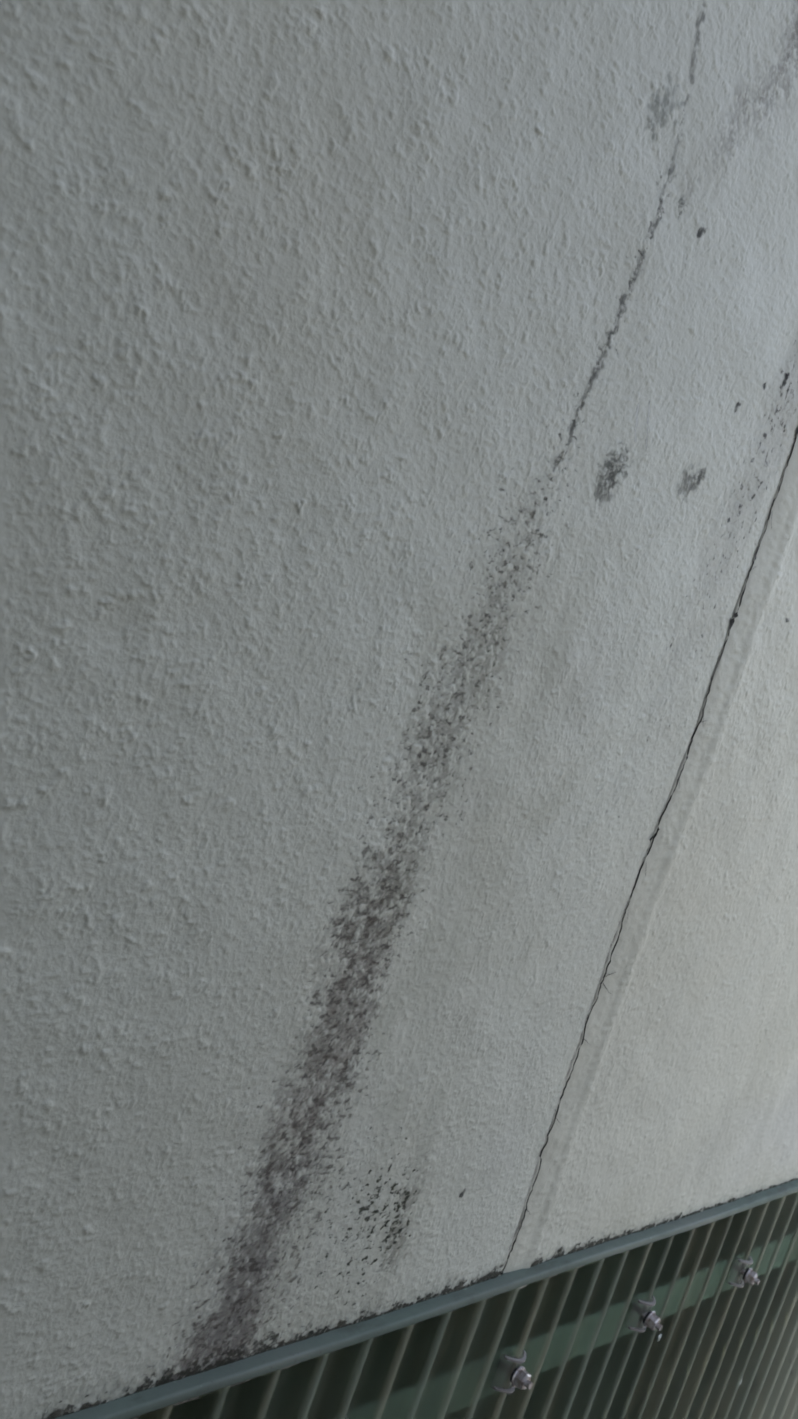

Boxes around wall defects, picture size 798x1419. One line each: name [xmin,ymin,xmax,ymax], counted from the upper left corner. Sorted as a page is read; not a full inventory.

crack [569,200,662,442]
water stain [404,667,489,781]
crack [502,429,798,1275]
water stain [43,822,503,1419]
water stain [530,1178,798,1267]